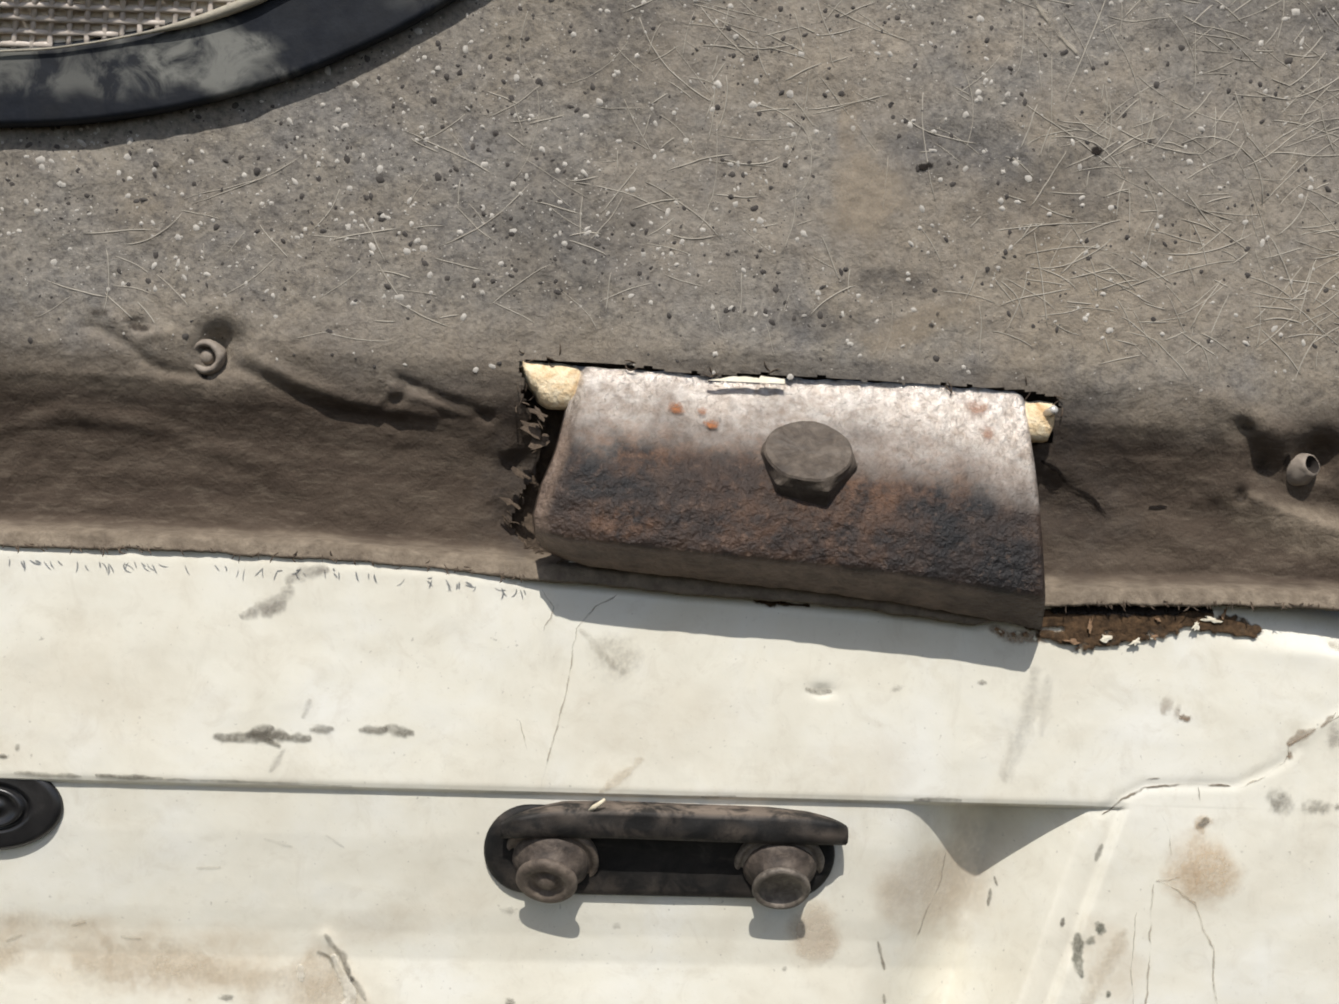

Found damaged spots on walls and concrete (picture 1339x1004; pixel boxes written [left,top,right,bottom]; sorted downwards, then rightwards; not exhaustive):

rust [994,605,1262,651]
crack [520,658,573,760]
crack [1102,778,1262,815]